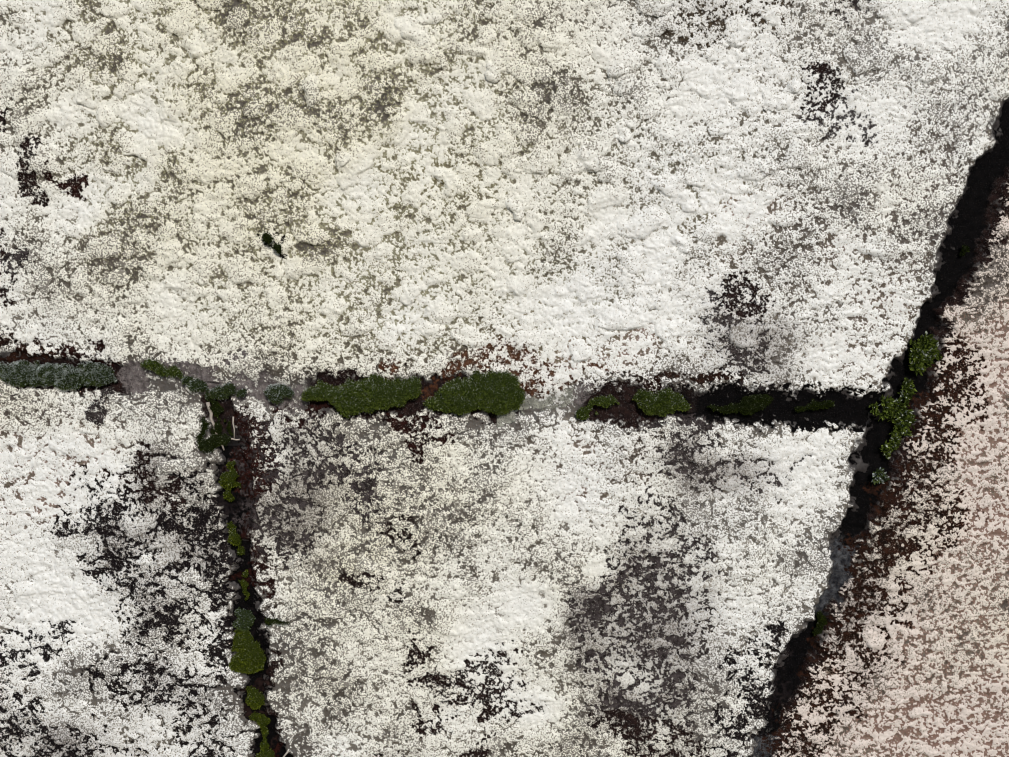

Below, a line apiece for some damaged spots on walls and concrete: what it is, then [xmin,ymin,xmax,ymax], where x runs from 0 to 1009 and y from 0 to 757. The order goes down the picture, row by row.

damp [0,245,35,276]
damp [16,134,89,207]
crack [0,350,126,398]
damp [0,414,421,757]
crack [201,395,293,757]
crack [309,363,521,425]
damp [566,410,812,757]
crack [583,101,1009,757]